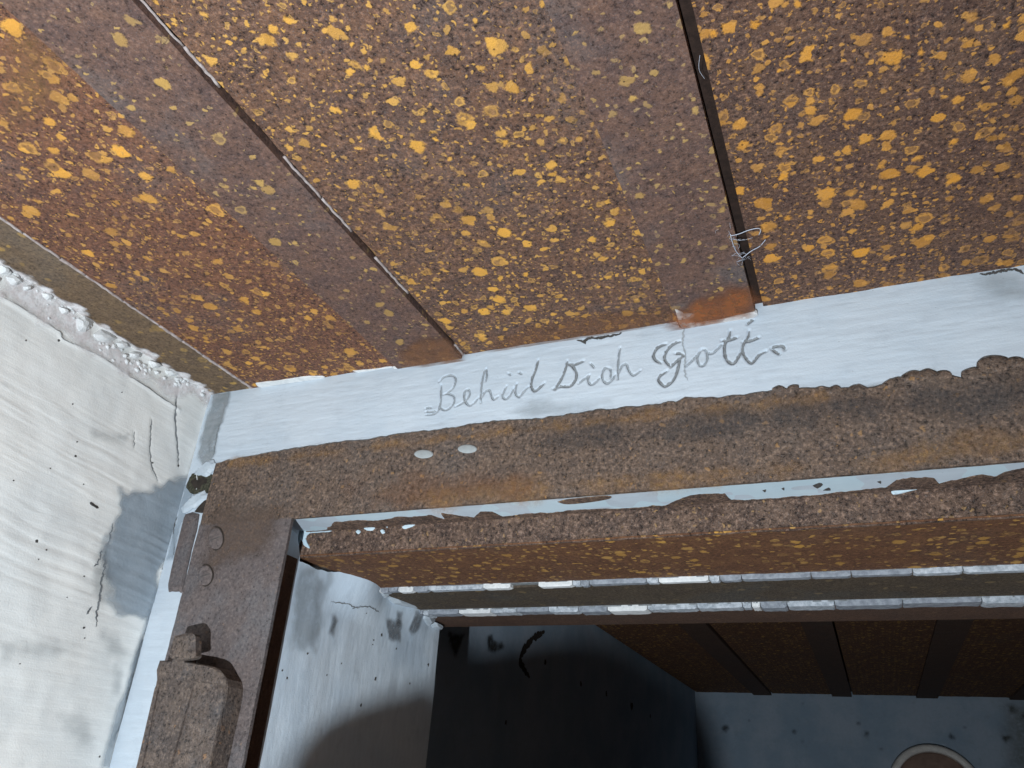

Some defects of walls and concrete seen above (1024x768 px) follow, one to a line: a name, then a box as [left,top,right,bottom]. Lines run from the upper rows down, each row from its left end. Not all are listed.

corrosion [673,291,753,329]
corrosion [401,341,461,366]
spalling [256,376,325,388]
crack [87,502,113,626]
water stain [103,478,192,766]